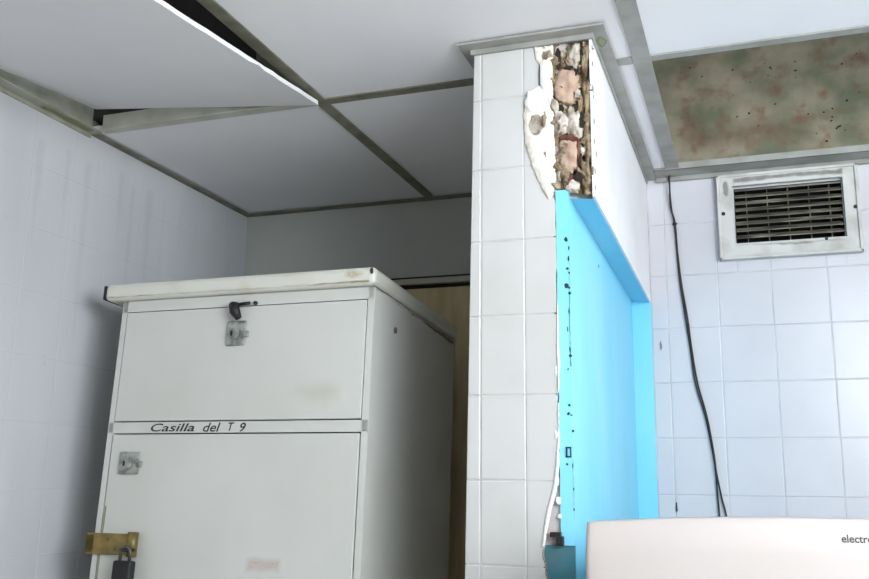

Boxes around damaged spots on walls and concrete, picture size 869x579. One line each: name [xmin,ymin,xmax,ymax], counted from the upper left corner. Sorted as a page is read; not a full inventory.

spalling [523,40,597,199]